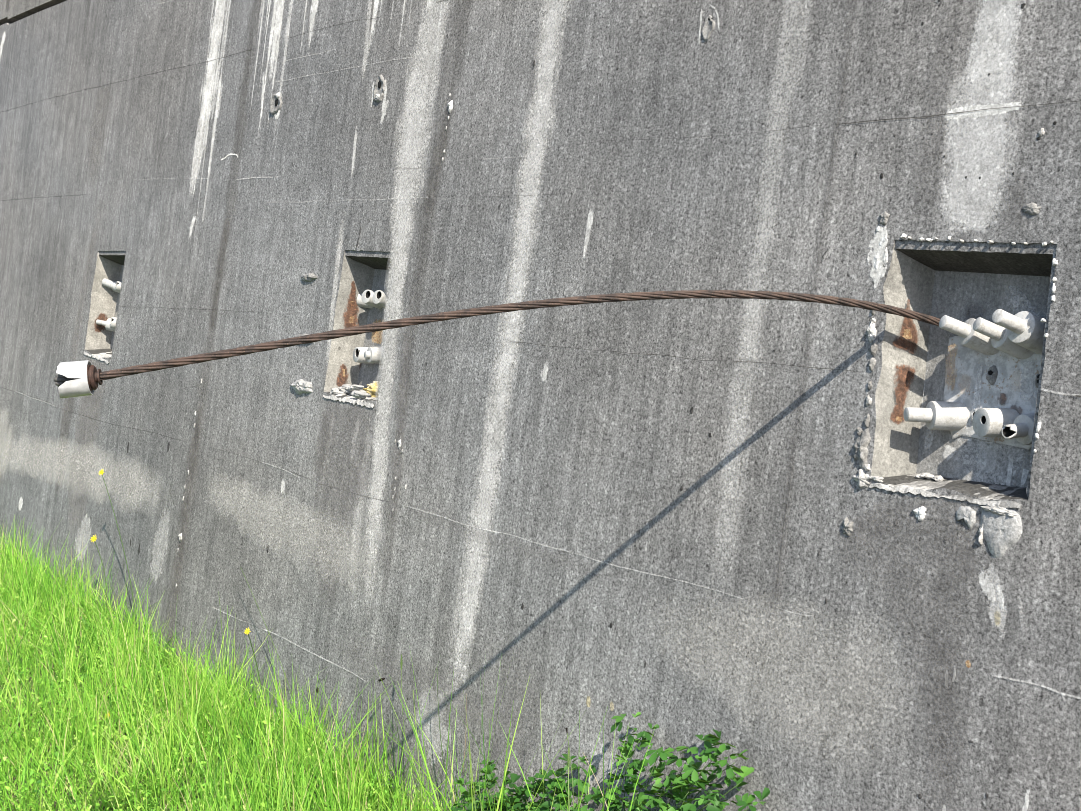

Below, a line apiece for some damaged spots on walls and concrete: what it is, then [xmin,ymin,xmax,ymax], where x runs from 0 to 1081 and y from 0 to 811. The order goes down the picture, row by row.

leakage [301,0,318,45]
leakage [259,0,285,126]
leakage [194,122,205,175]
corrosion [344,281,359,328]
corrosion [893,299,918,353]
corrosion [891,365,915,424]